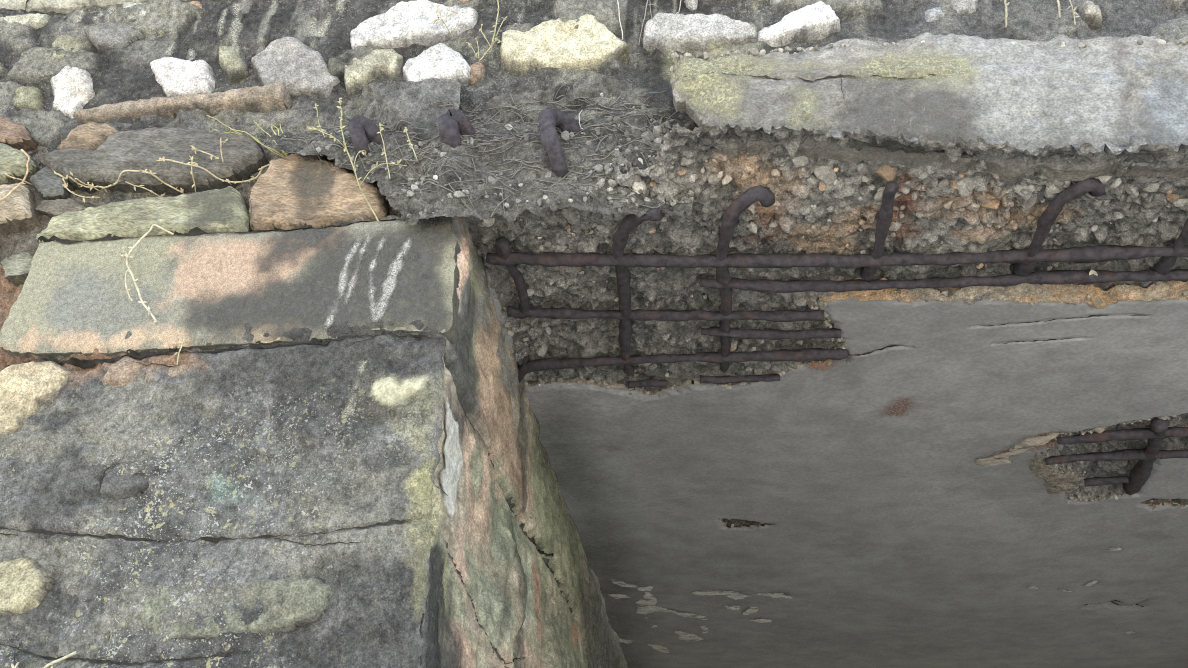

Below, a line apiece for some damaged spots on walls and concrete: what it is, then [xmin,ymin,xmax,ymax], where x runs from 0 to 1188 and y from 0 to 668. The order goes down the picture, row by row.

spalling [268,76,1188,397]
crack [981,315,1147,344]
crack [59,331,494,469]
peeling [371,377,426,404]
spalling [976,413,1188,510]
crack [0,518,423,546]
crack [505,497,573,613]
spalling [719,518,767,528]
crack [445,541,524,668]
peeling [608,579,708,641]
peeling [692,590,793,623]
crack [0,643,247,665]